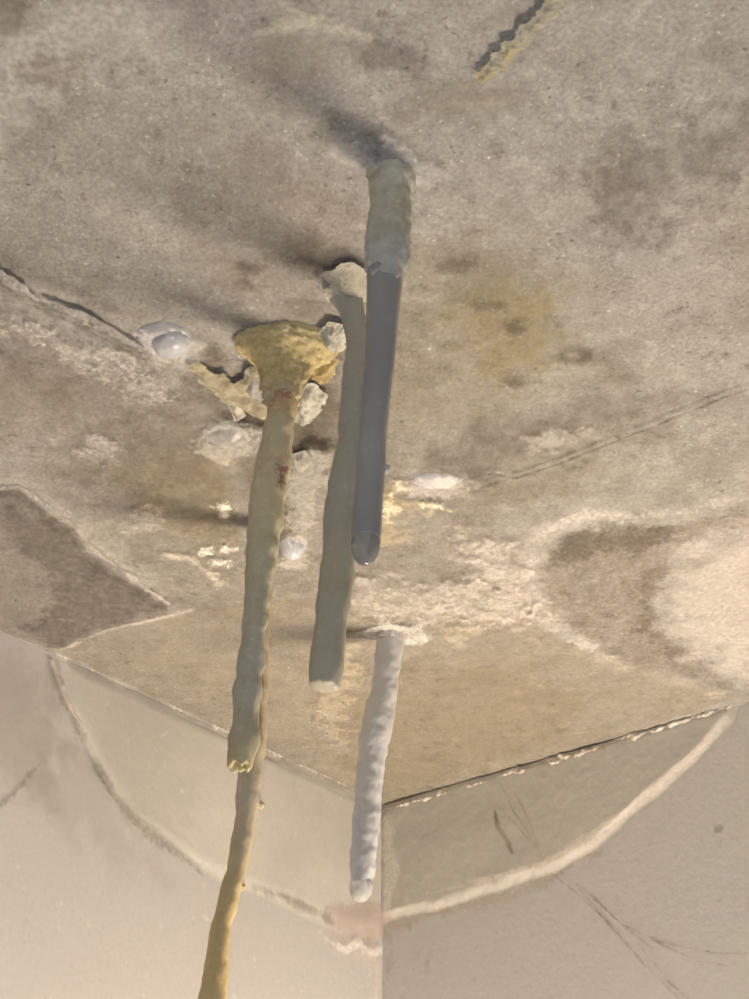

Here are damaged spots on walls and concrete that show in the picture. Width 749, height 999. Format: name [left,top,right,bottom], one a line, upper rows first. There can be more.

crack [0,270,144,352]
peeling [0,485,171,605]